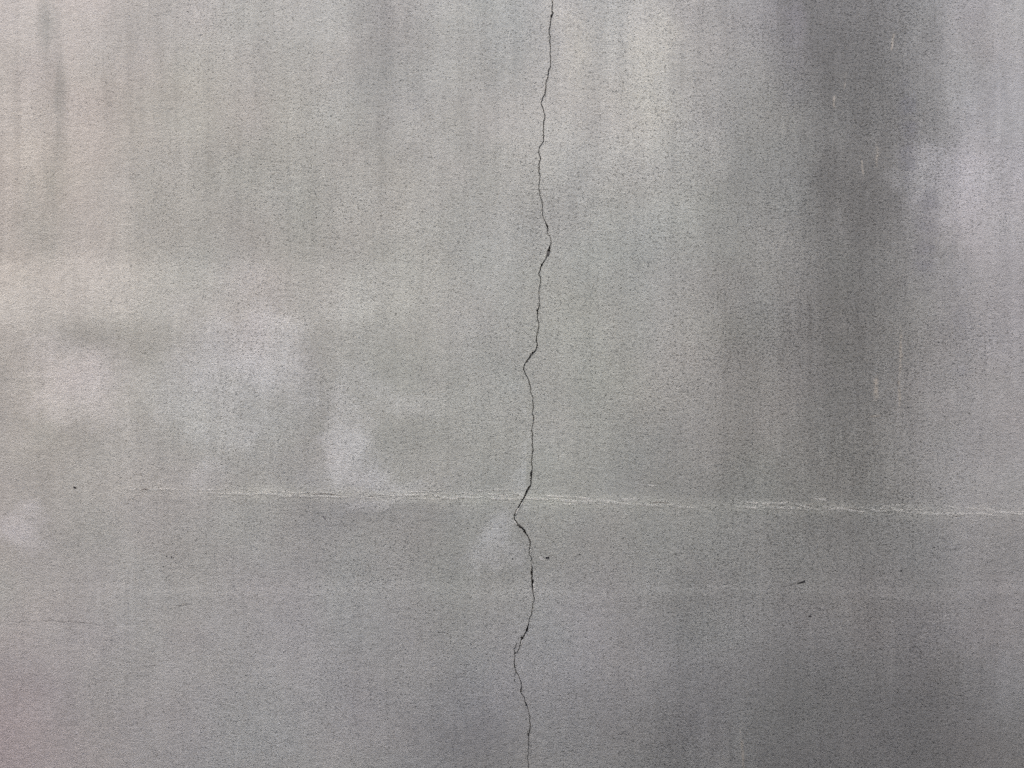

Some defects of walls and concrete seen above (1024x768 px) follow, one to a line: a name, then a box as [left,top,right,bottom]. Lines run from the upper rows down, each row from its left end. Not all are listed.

crack [514,0,553,768]